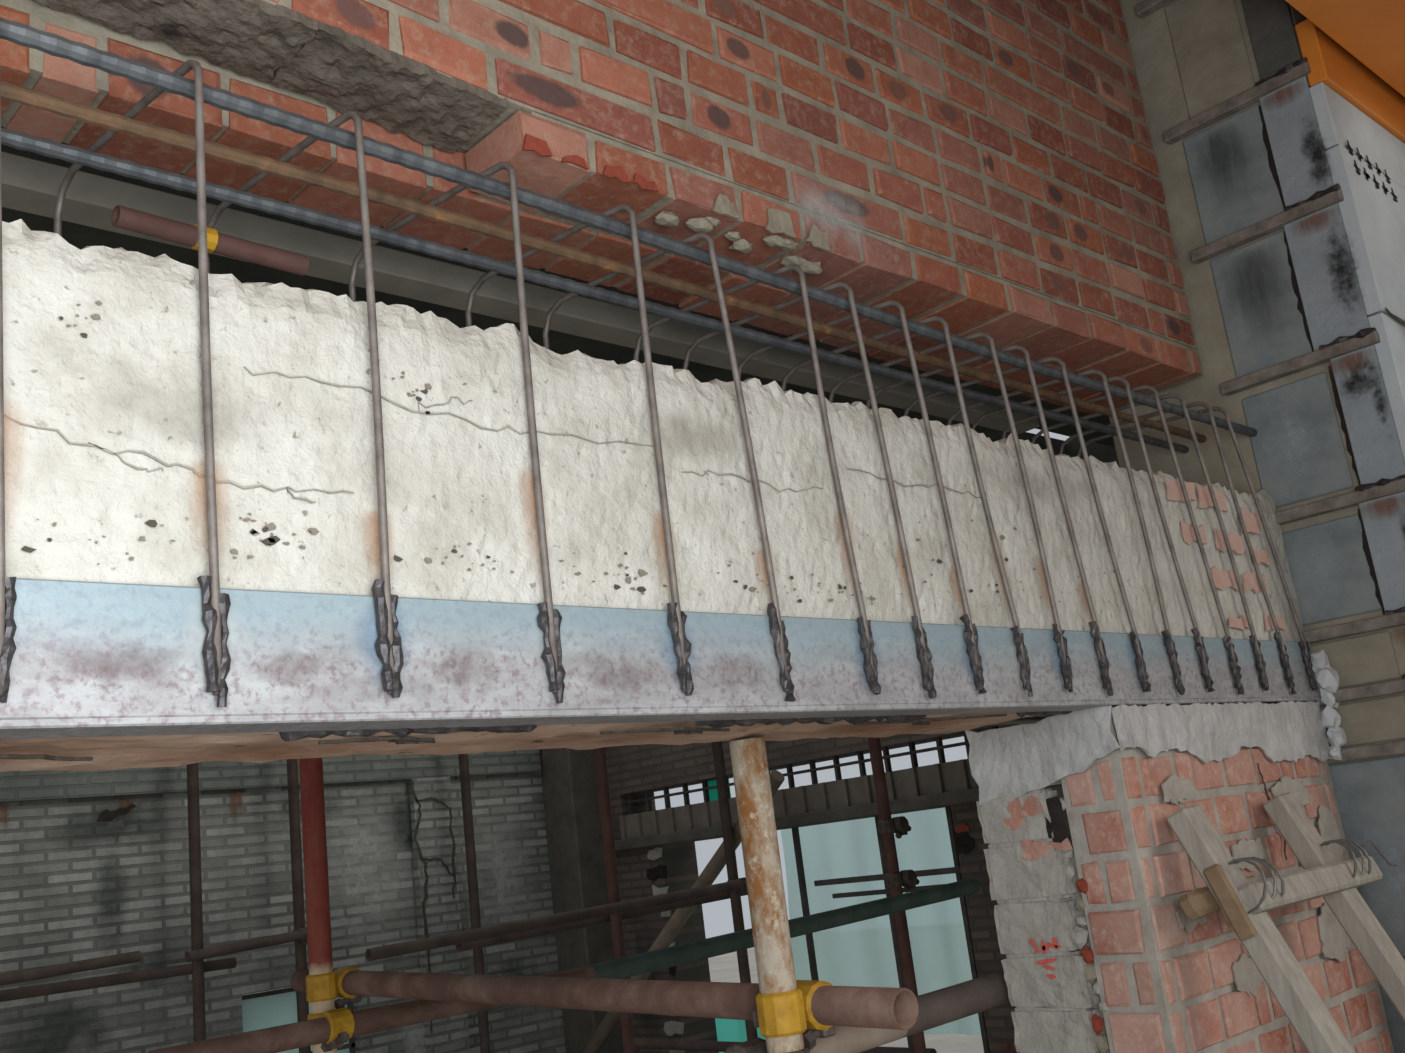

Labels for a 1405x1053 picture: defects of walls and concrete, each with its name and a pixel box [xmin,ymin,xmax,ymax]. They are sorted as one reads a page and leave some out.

spalling [59,301,102,338]
crack [244,366,654,446]
crack [4,414,354,503]
crack [683,468,981,498]
crack [412,781,456,973]
spalling [1002,796,1109,1053]